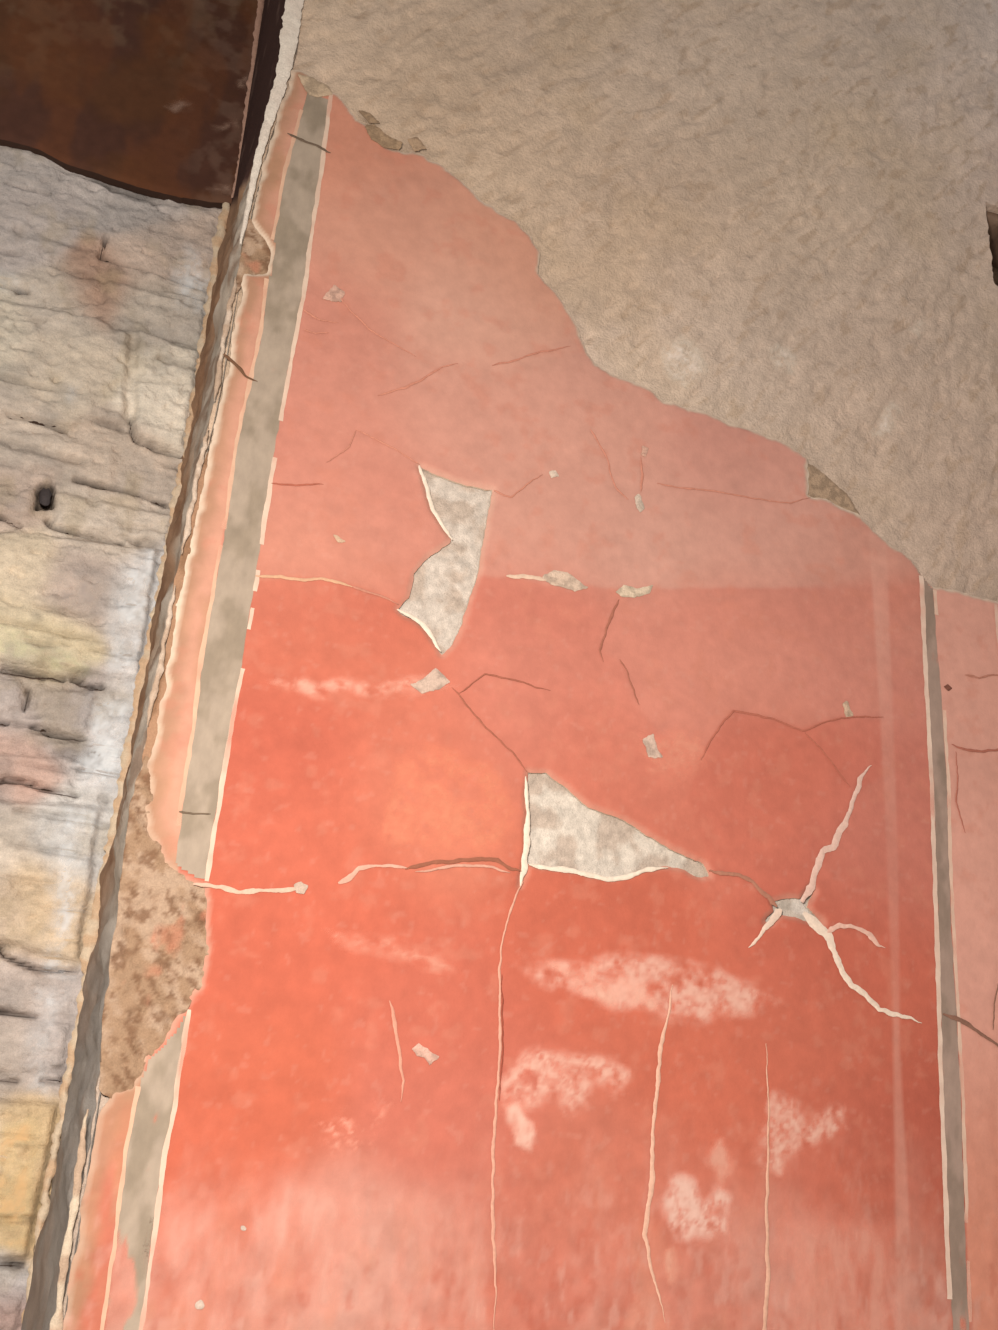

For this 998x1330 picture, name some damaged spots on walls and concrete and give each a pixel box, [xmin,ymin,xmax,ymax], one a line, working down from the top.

flaking render [397,465,491,694]
flaking render [807,463,859,514]
flaking render [99,451,209,1098]
crack [193,857,523,1330]
leakage [502,1052,627,1147]
flaking render [520,773,707,886]
leakage [537,957,756,1019]
crack [642,985,673,1321]
leakage [664,1142,730,1240]
crack [762,1047,770,1330]
leakage [769,1094,842,1174]
crack [701,710,998,1046]